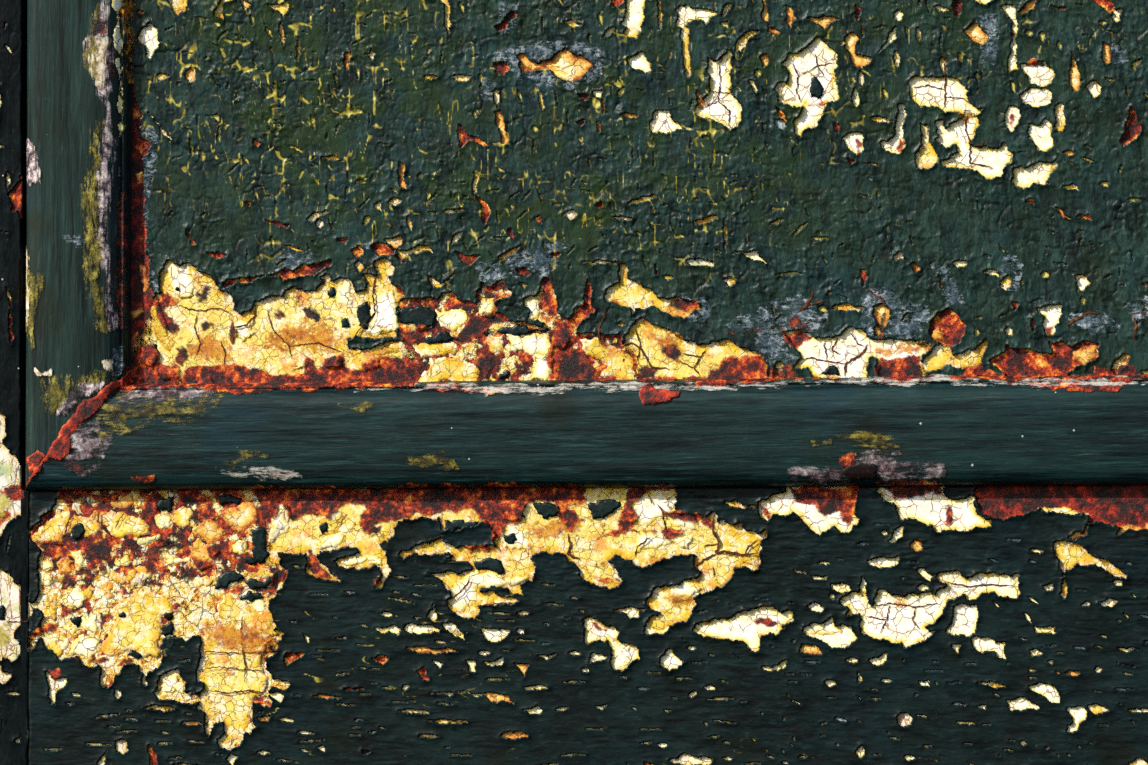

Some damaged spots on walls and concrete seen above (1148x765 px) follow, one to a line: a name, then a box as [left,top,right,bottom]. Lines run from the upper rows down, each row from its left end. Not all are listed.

peeling [695,0,872,137]
crack [793,55,834,102]
peeling [871,0,1074,189]
rust [0,0,510,525]
peeling [132,216,988,383]
rust [540,276,854,404]
crack [65,512,124,534]
rust [252,475,586,554]
rust [789,484,860,526]
crack [7,586,27,623]
crack [201,616,276,694]
peeling [0,486,1020,765]